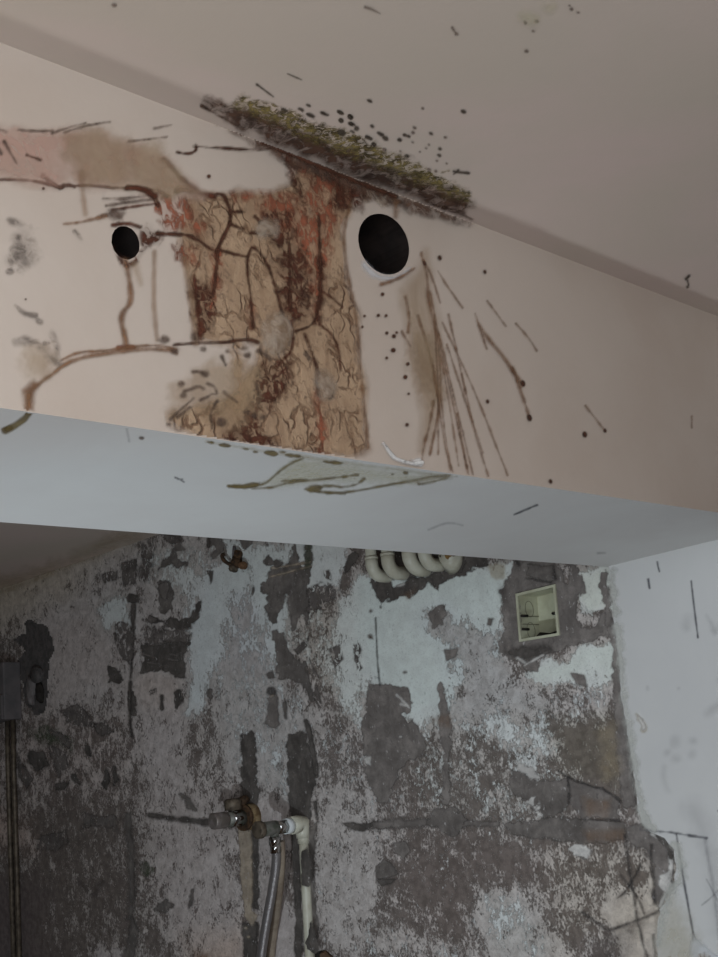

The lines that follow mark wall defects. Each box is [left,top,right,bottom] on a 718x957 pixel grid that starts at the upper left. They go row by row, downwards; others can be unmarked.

crack [0,146,333,399]
leakage [0,97,471,494]
leakage [402,290,489,459]
leakage [478,323,532,421]
flaking render [102,534,202,711]
flaking render [251,542,336,728]
flaking render [329,643,362,671]
peeling [370,551,488,608]
flaking render [428,605,447,629]
flaking render [361,684,426,803]
flaking render [426,682,467,837]
peeling [487,560,683,942]